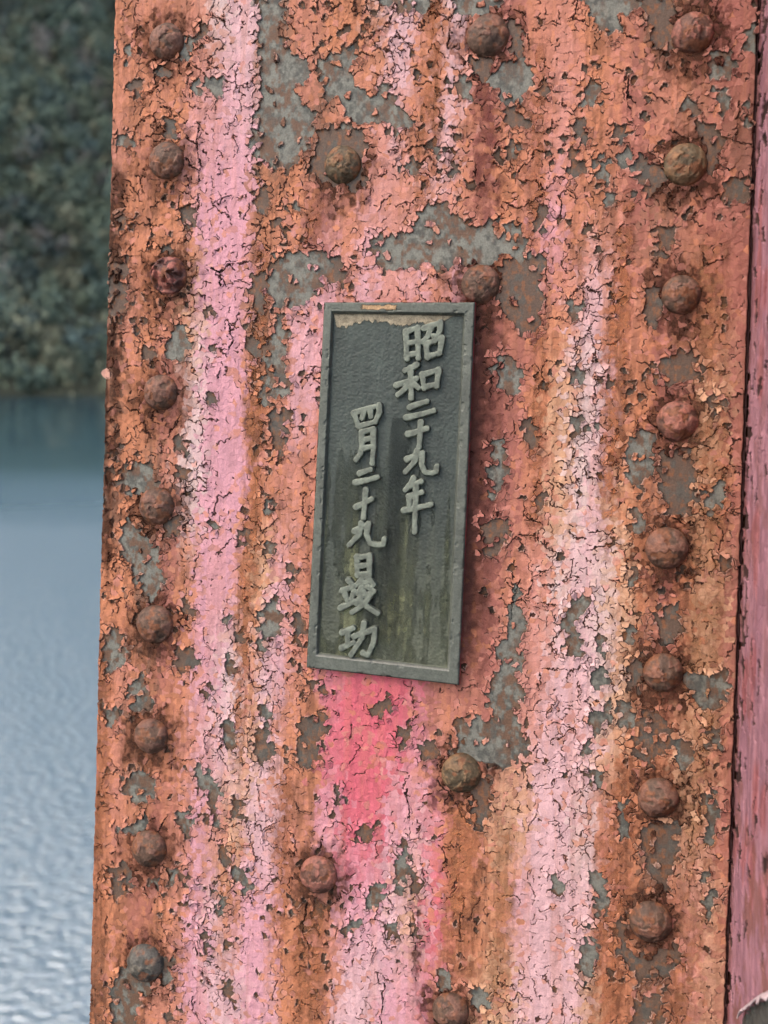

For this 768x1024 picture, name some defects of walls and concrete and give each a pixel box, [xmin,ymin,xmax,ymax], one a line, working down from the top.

crack [195,122,203,182]
peeling [244,0,423,230]
peeling [372,0,682,218]
crack [211,264,235,287]
corrosion [655,262,714,340]
corrosion [638,390,705,456]
peeling [112,429,351,808]
corrosion [631,639,695,714]
peeling [550,559,733,921]
corrosion [626,765,695,835]
peeling [101,759,258,1009]
crack [294,902,308,944]